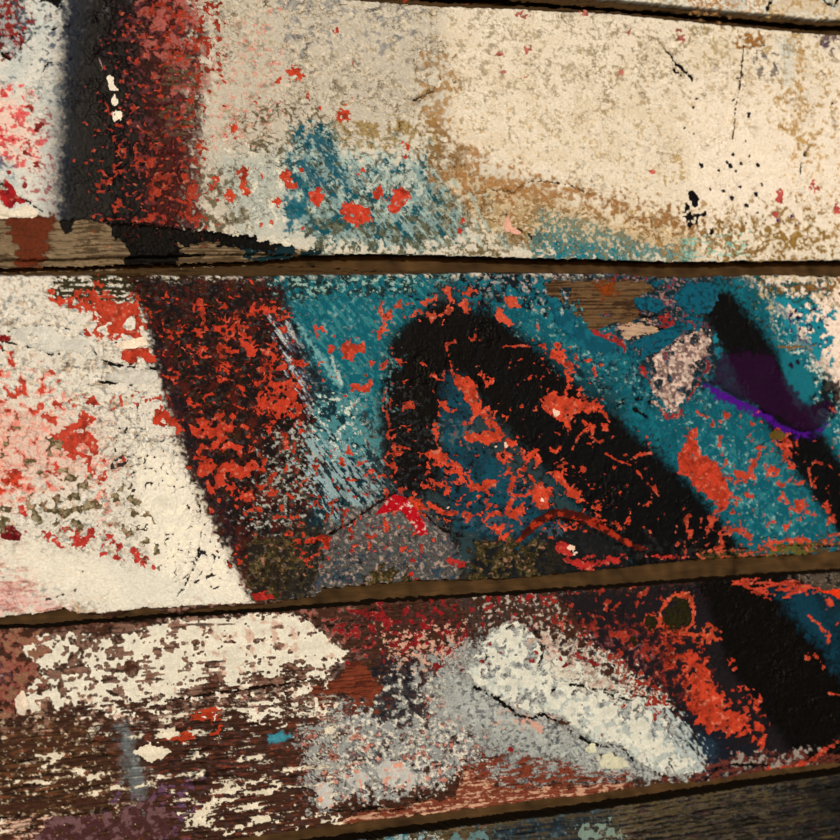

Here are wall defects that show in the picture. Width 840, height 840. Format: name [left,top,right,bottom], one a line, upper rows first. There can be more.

peeling [33,6,55,52]
peeling [234,0,456,161]
peeling [12,122,45,167]
peeling [72,0,309,248]
peeling [0,170,39,219]
peeling [308,187,325,207]
peeling [339,201,373,228]
peeling [373,186,412,214]
crack [472,179,589,240]
peeling [8,586,770,840]
crack [473,685,634,762]
crack [506,621,771,781]